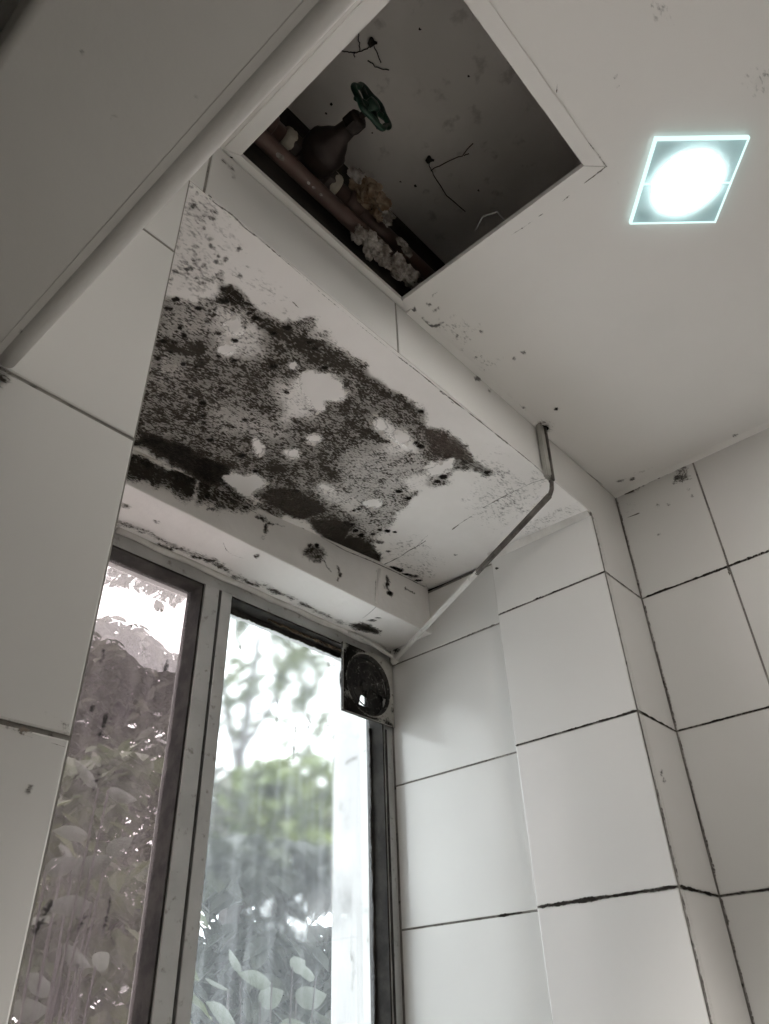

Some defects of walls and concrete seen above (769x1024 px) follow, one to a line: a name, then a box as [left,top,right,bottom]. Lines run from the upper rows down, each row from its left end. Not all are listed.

water stain [117,520,382,634]
water stain [126,192,495,596]